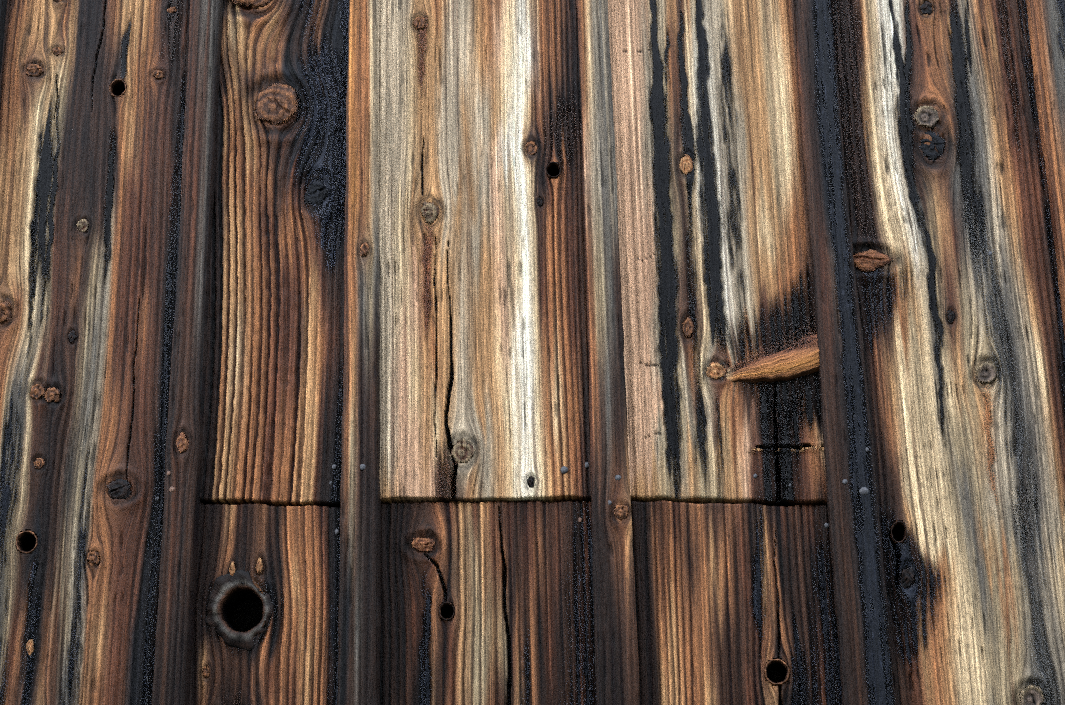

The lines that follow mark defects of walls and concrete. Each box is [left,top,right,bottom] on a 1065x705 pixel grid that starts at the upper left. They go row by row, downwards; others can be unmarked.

crack [434,238,458,499]
crack [756,382,824,503]
crack [424,553,447,602]
crack [498,507,512,705]
crack [773,532,781,658]